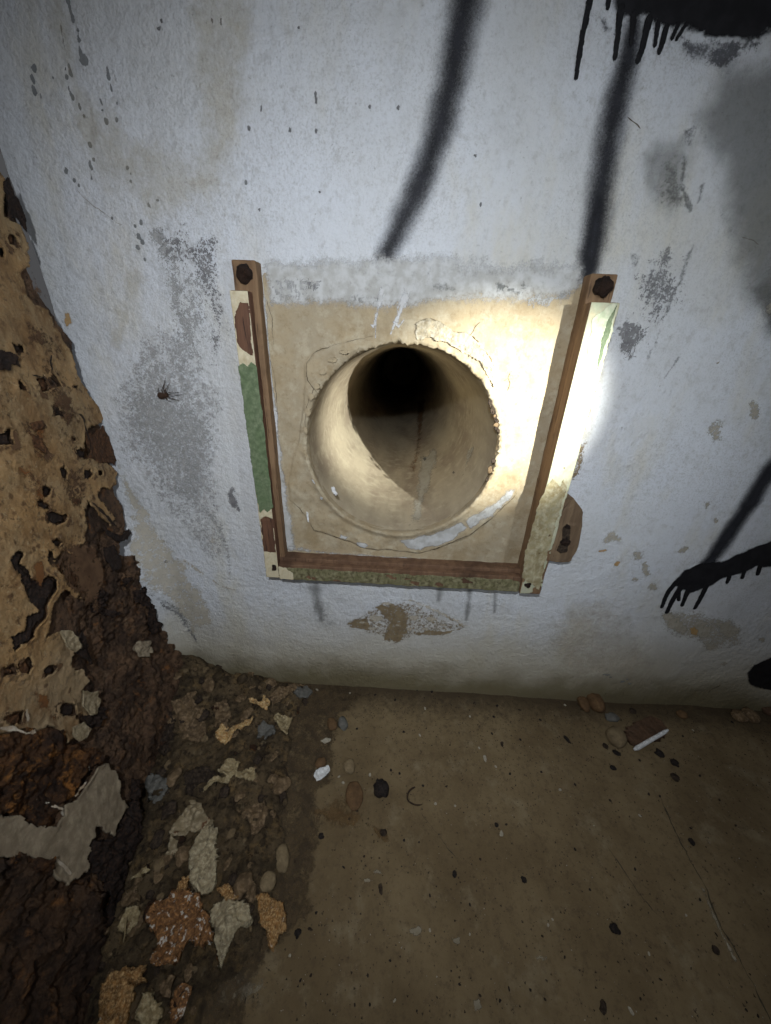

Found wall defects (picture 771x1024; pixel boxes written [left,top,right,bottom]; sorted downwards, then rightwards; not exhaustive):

peeling [0,173,213,743]
leakage [115,222,238,573]
leakage [613,247,691,360]
flaking render [346,600,464,643]
peeling [0,763,129,886]
crack [661,799,771,1022]